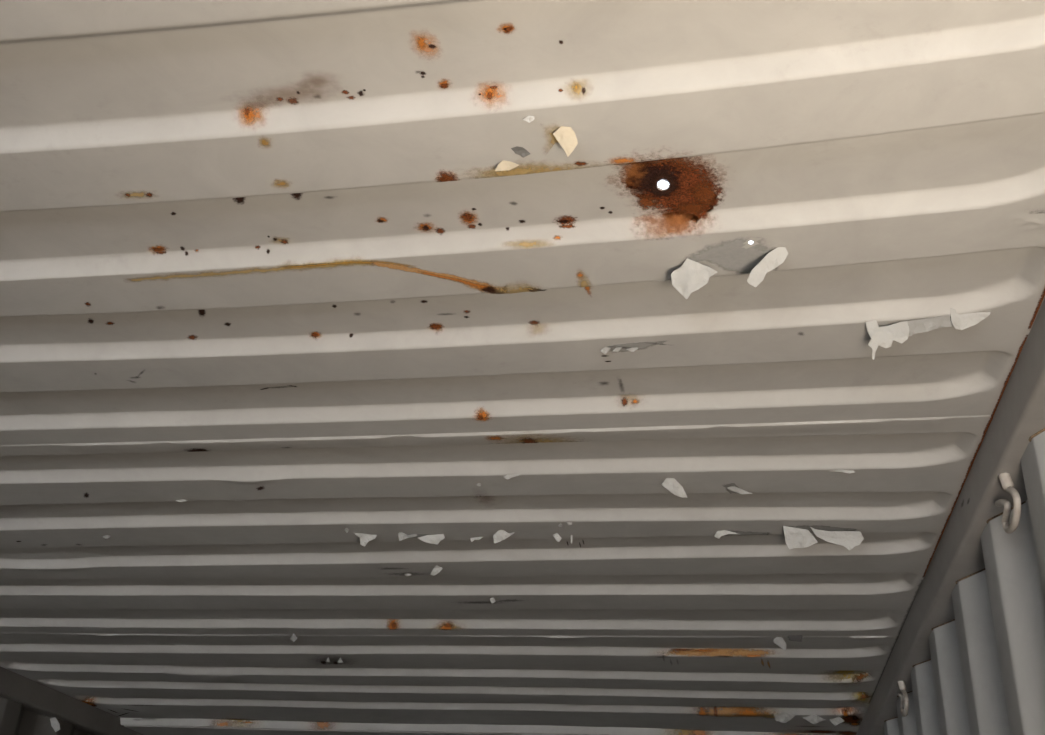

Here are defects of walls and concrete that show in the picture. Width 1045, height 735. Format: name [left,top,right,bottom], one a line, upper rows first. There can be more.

rust [479,85,503,102]
rust [559,84,586,95]
peeling [549,126,578,157]
rust [488,162,586,176]
rust [130,260,547,294]
peeling [671,239,788,299]
peeling [865,308,991,360]
peeling [662,478,688,498]
rust [781,289,1045,735]
peeling [398,532,445,544]
peeling [783,526,864,550]
rust [659,648,770,668]